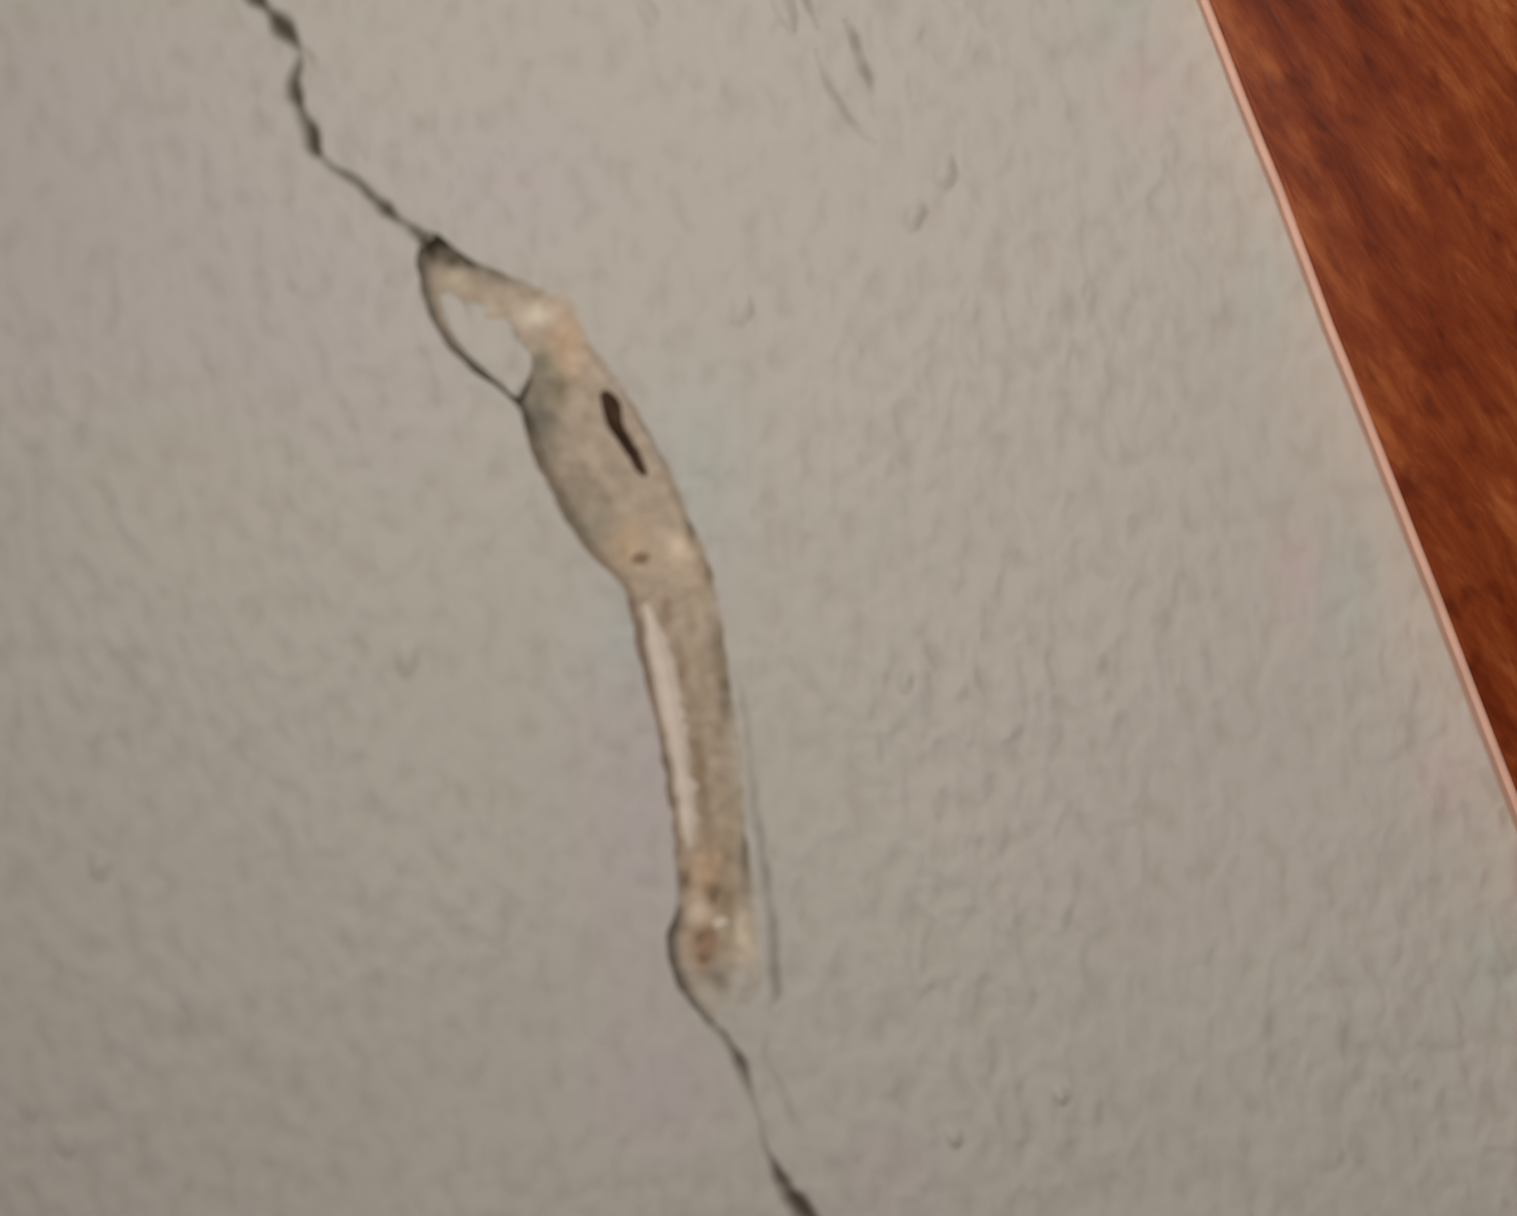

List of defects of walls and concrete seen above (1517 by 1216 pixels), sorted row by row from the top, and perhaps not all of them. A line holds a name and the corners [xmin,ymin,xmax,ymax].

crack [242,0,433,248]
crack [769,0,879,146]
crack [700,1011,821,1216]